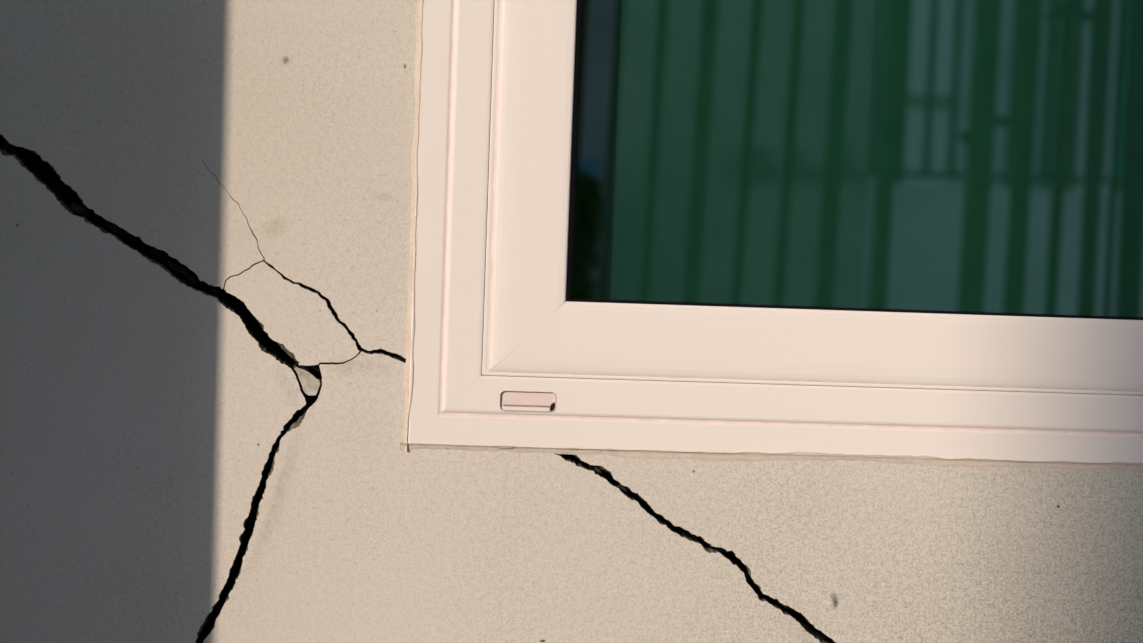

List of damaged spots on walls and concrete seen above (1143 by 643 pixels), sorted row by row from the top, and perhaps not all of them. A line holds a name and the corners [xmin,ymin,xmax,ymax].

crack [0,134,406,643]
crack [557,454,836,643]